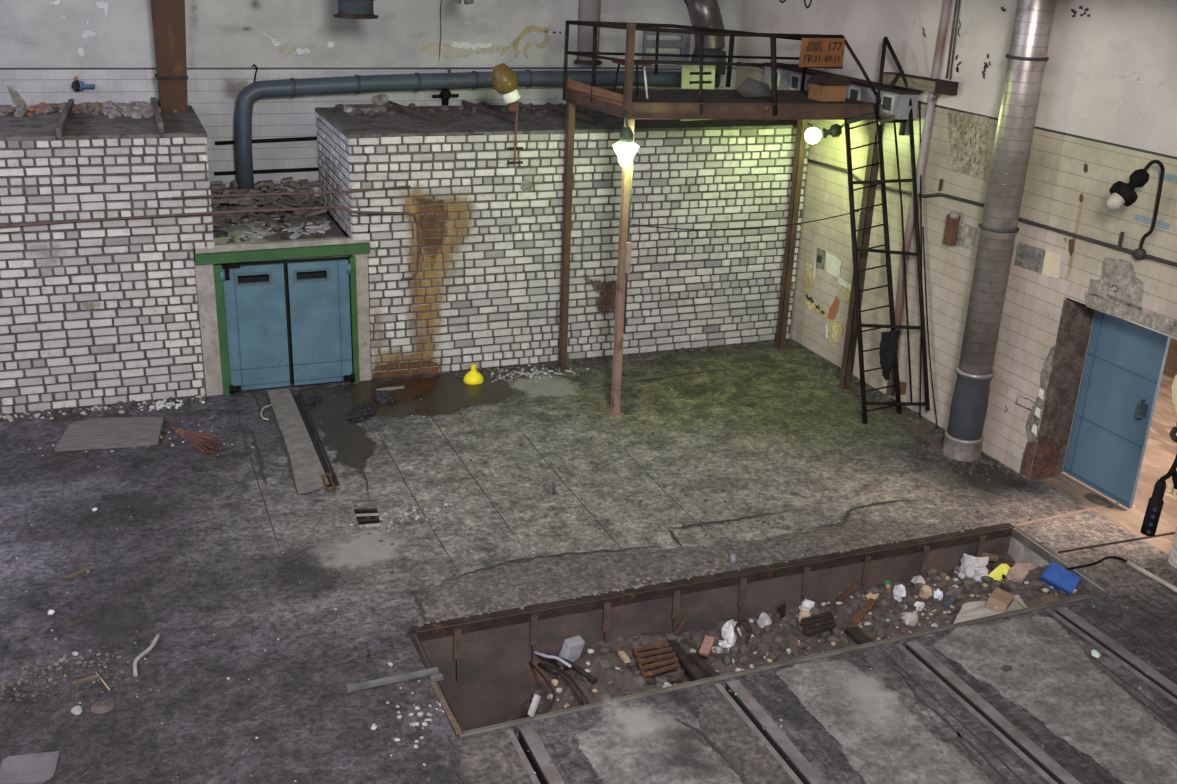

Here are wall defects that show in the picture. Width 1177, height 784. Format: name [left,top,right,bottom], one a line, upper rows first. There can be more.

peeling [947,111,990,179]
rust [372,189,471,379]
water stain [298,362,579,474]